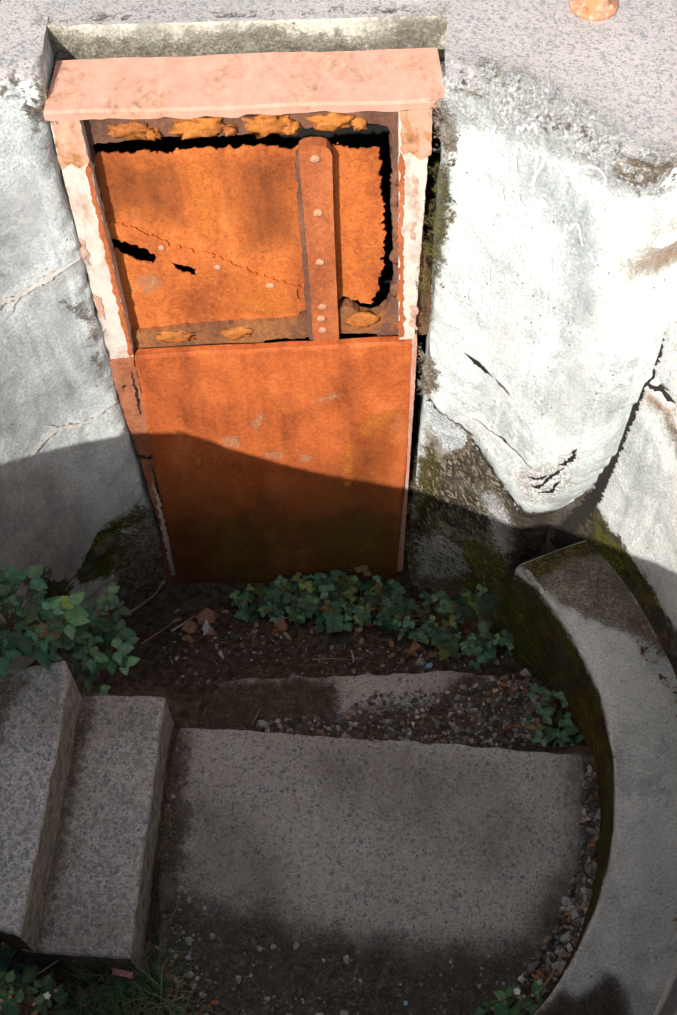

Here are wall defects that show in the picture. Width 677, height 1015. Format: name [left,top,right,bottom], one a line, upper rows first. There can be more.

rust [102,112,368,141]
rust [155,331,198,343]
rust [220,327,254,341]
crack [426,398,539,478]
leakage [413,397,677,669]